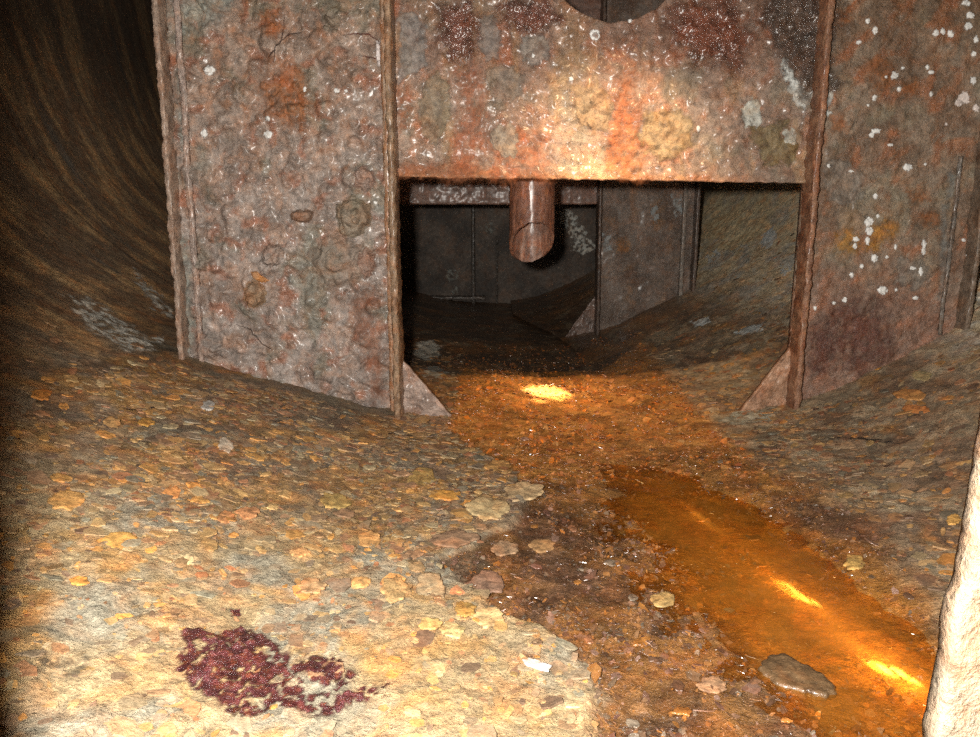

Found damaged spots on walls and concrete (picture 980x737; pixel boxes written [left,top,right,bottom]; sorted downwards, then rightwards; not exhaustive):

rust [401,0,546,176]
rust [498,0,565,33]
rust [664,0,754,72]
rust [760,0,820,99]
water stain [781,58,813,107]
rust [828,57,841,92]
water stain [955,77,980,112]
water stain [962,0,979,56]
rust [290,208,314,223]
rust [304,165,377,291]
water stain [849,214,897,278]
rust [0,233,980,737]